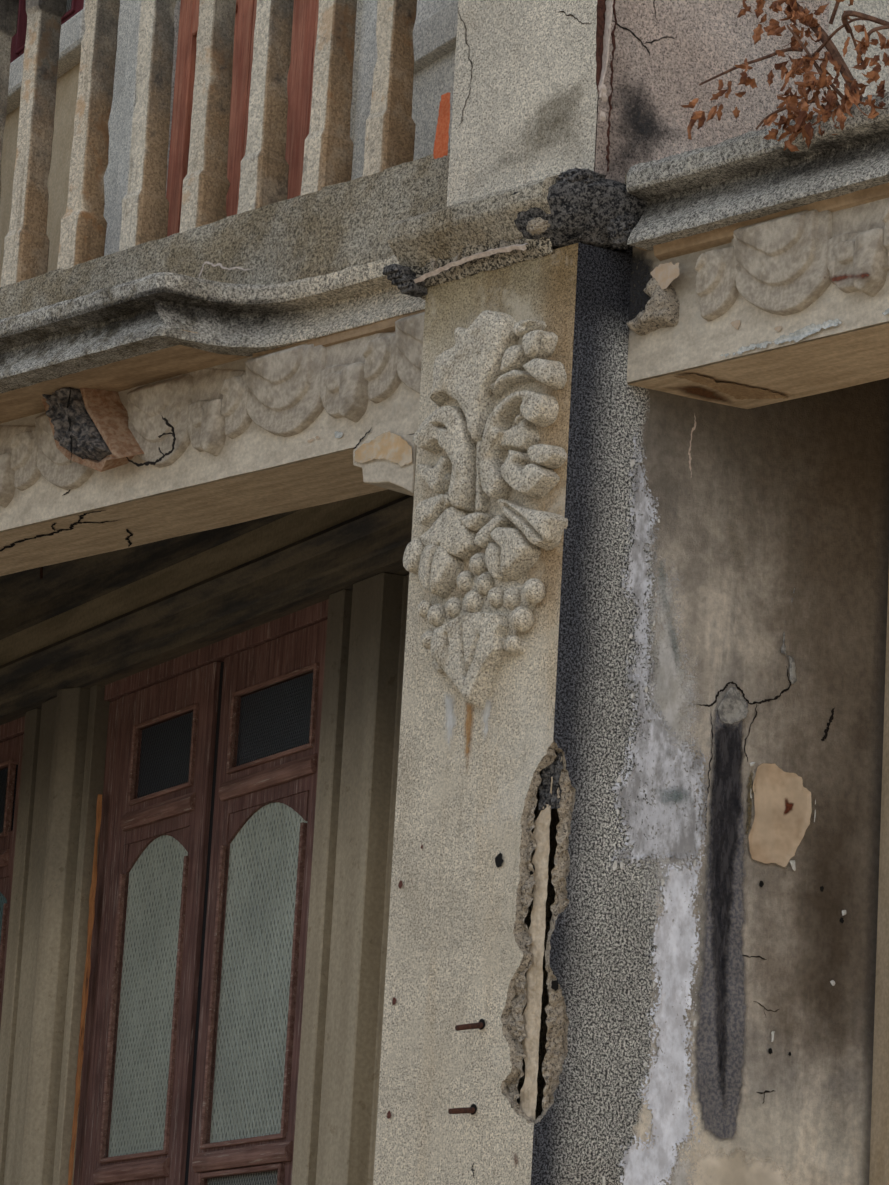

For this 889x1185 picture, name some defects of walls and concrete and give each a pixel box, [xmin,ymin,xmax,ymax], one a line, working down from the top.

crack [556,0,675,171]
spalling [382,168,647,300]
crack [65,387,73,457]
peeling [354,431,412,467]
crack [0,490,133,552]
peeling [611,428,710,1185]
spalling [717,687,748,724]
crack [691,666,791,829]
peeling [746,762,816,871]
spalling [501,739,576,1125]
water stain [696,710,747,1139]